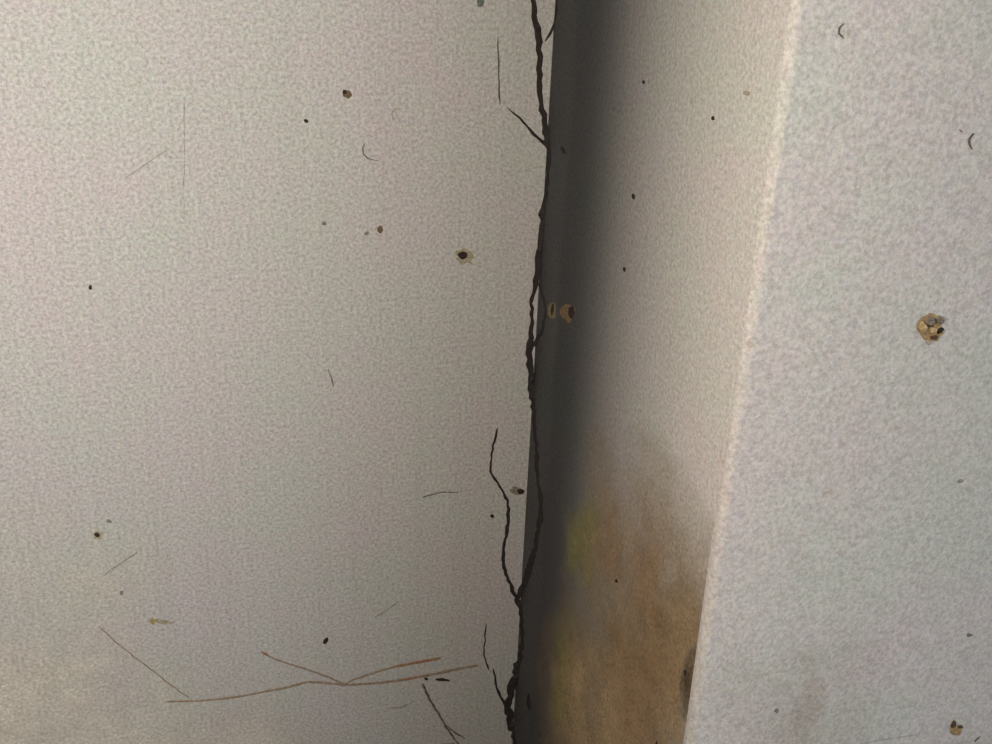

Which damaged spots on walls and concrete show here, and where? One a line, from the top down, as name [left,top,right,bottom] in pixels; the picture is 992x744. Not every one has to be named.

crack [99,0,558,744]
water stain [551,489,700,744]